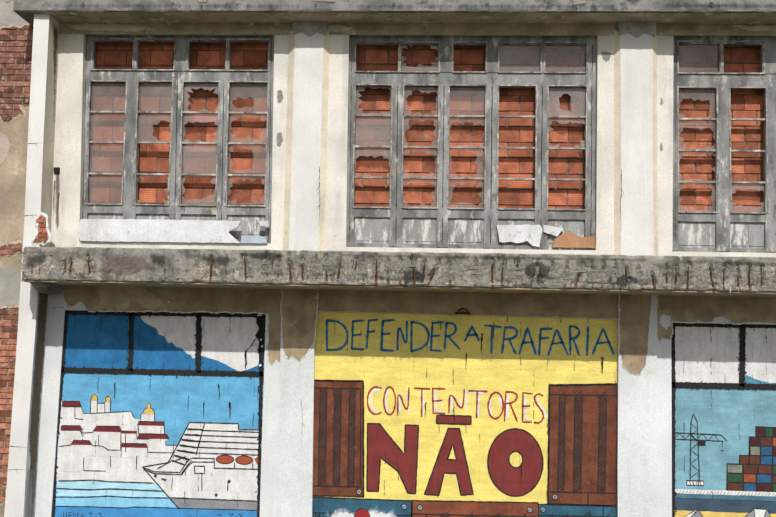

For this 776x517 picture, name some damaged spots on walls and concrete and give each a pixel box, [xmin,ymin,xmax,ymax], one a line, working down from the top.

flaking render [0,23,33,123]
peeling [0,212,776,376]
flaking render [0,305,19,506]